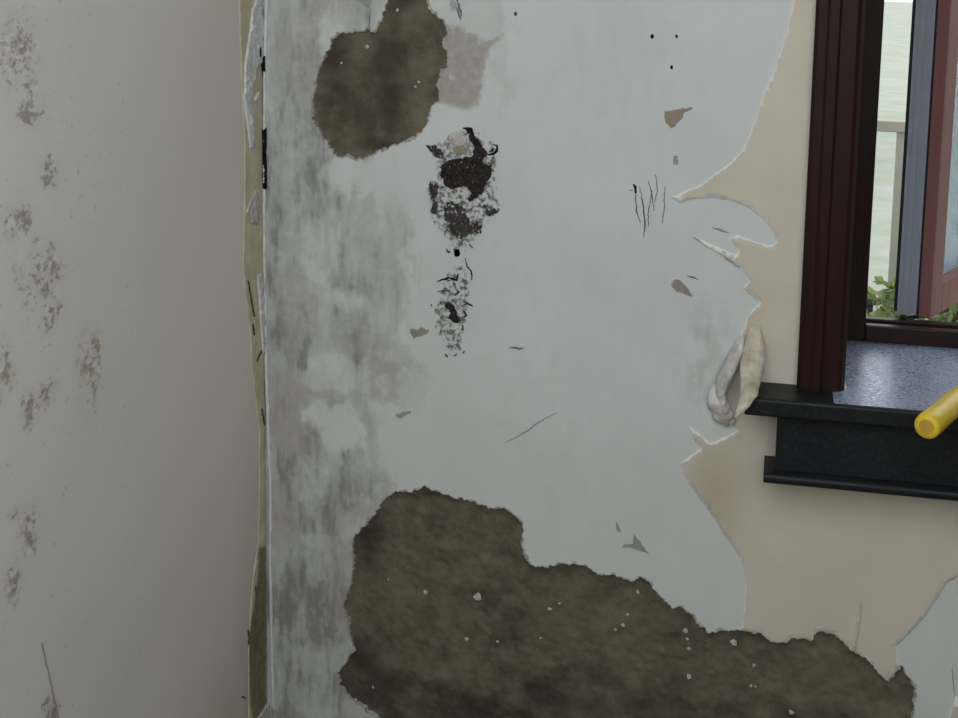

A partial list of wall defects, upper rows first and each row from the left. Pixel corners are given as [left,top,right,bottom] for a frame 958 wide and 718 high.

peeling [239,0,268,718]
mould [410,127,499,357]
spalling [671,276,699,297]
spalling [335,485,917,718]